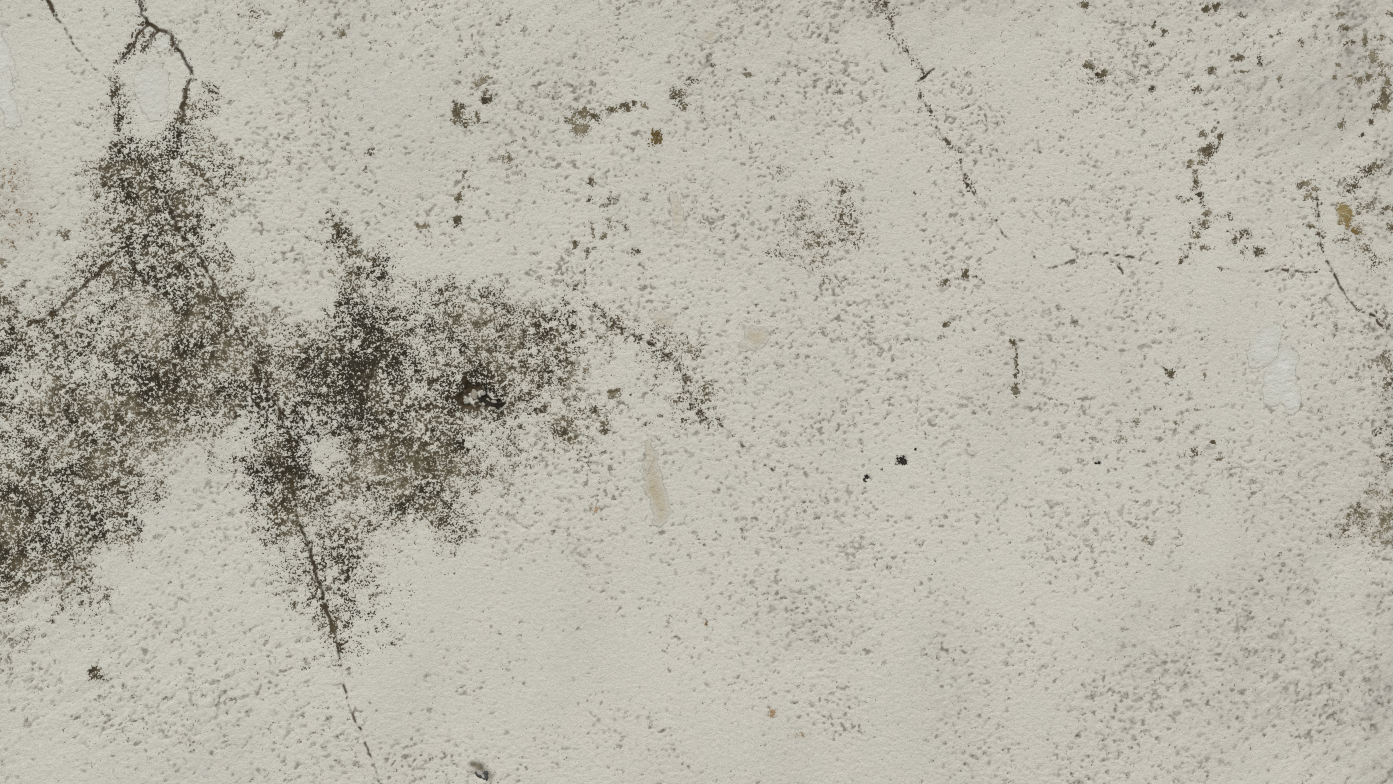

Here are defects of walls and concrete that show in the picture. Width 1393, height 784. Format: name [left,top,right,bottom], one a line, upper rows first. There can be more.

crack [46,0,197,138]
crack [868,0,1003,234]
crack [24,254,186,334]
damp [0,36,670,686]
crack [1033,252,1158,274]
crack [1265,191,1391,330]
crack [164,196,379,782]